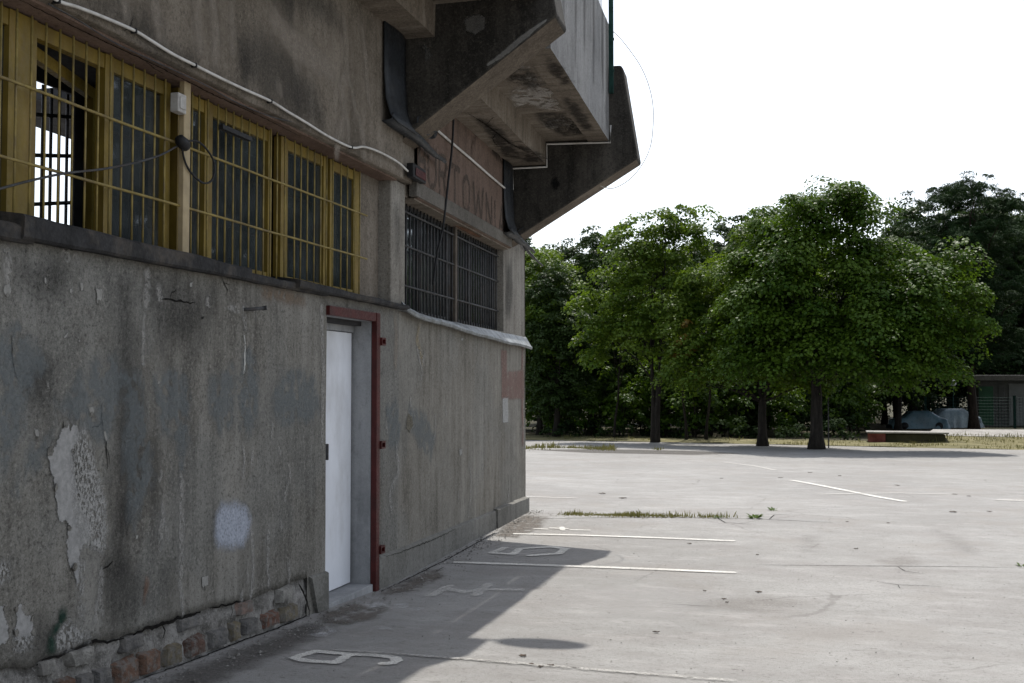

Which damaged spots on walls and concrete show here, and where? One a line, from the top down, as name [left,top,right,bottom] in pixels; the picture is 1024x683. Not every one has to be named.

damp [510,64,591,136]
crack [162,290,196,304]
peeling [47,421,108,650]
peeling [0,604,36,653]